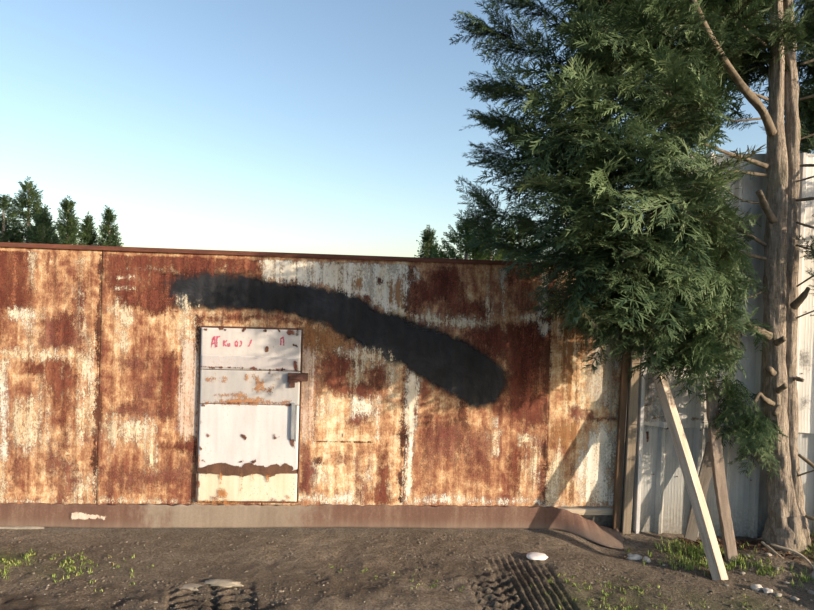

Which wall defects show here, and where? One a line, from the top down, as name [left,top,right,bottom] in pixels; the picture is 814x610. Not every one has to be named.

corrosion [6,436,28,486]
corrosion [0,250,37,342]
corrosion [27,252,409,506]
corrosion [376,266,616,506]